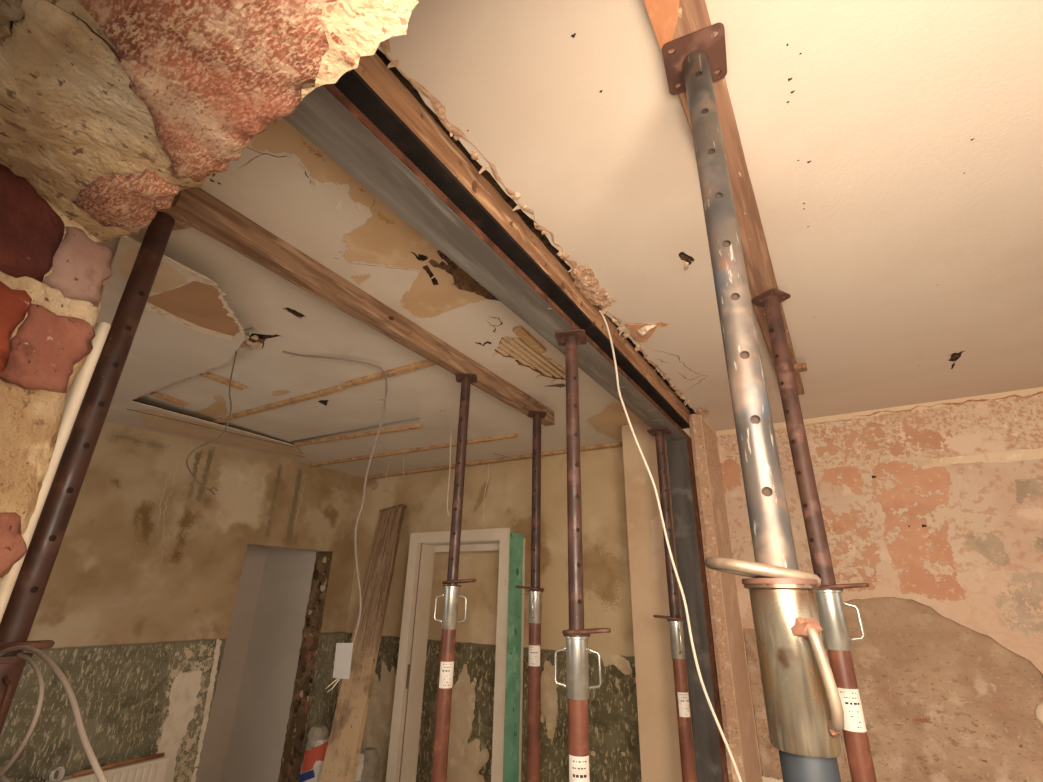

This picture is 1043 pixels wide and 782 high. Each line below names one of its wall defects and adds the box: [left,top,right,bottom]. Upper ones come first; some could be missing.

flaking render [0,0,25,44]
peeling [251,117,486,318]
flaking render [379,38,744,782]
leakage [131,500,156,547]
leakage [167,447,216,565]
flaking render [813,417,1043,782]
peeling [156,639,222,782]
flaking render [743,628,783,780]